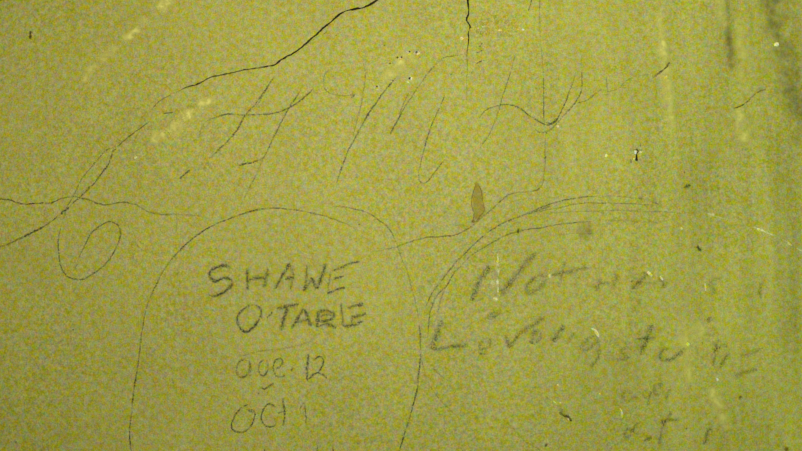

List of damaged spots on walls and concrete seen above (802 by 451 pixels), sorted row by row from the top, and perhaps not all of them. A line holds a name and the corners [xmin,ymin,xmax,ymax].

crack [184,0,385,89]
crack [462,0,475,45]